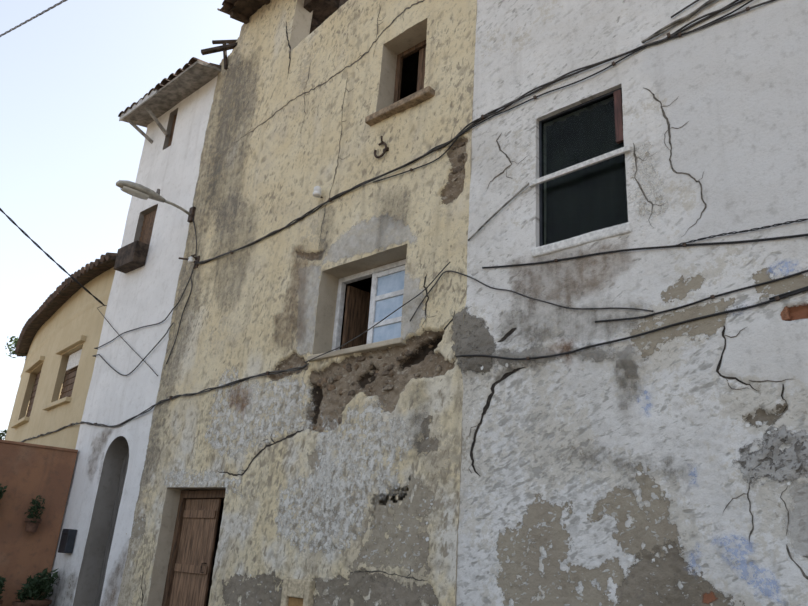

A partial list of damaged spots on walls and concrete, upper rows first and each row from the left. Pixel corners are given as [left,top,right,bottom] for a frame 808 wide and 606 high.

crack [215,0,424,264]
spalling [441,138,468,205]
crack [633,88,707,236]
crack [218,429,304,476]
peeling [205,330,456,606]
crack [468,367,525,476]
peeling [630,275,738,361]
crack [716,325,788,415]
peeling [752,268,808,321]
peeling [495,462,745,606]